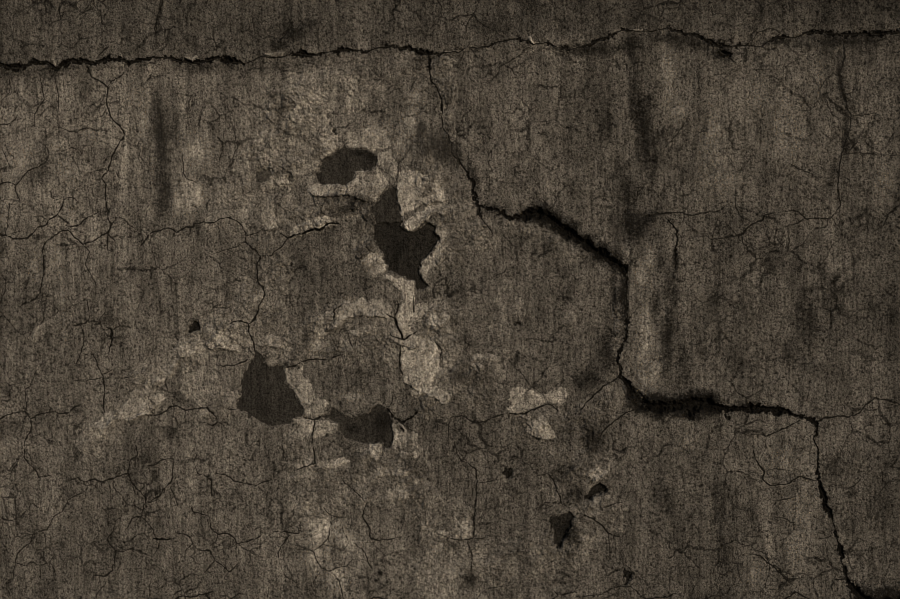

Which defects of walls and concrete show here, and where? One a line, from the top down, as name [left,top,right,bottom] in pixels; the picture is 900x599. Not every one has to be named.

crack [0,27,645,307]
flaking render [377,51,459,143]
crack [649,25,900,227]
crack [73,300,132,412]
crack [140,217,339,351]
crack [285,304,353,368]
flaking render [94,128,641,599]
crack [386,296,442,375]
crack [453,155,900,599]
crack [0,369,395,599]
crack [387,395,625,569]